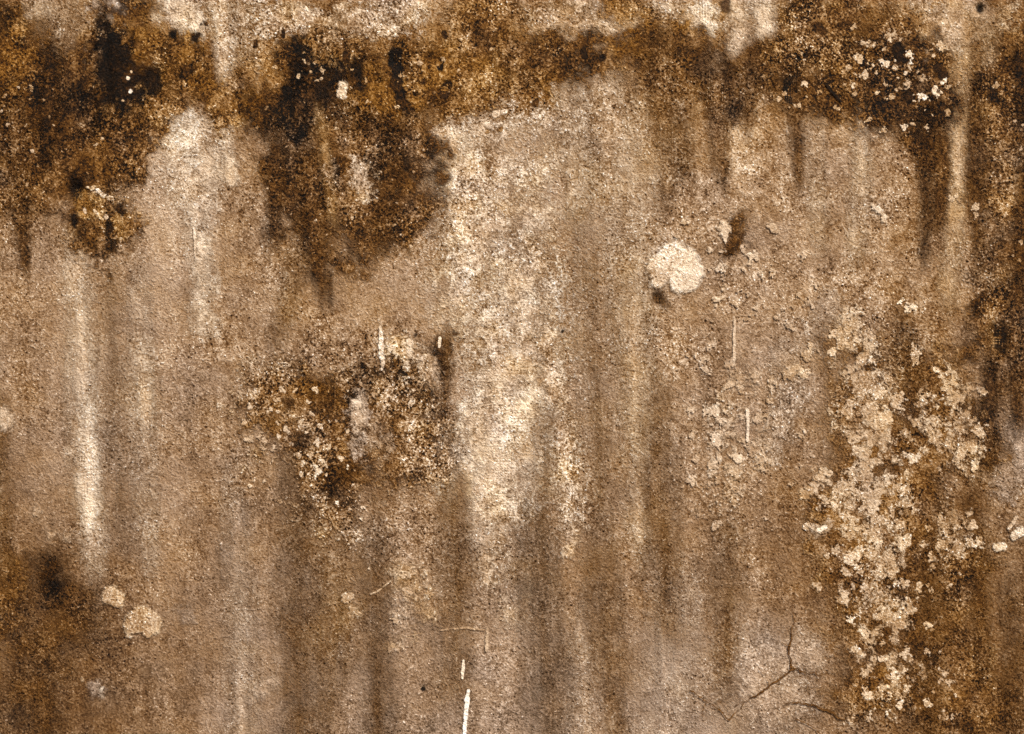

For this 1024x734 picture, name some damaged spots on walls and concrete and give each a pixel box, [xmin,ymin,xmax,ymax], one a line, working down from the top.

leakage [0,498,108,734]
peeling [217,352,487,548]
leakage [0,0,713,734]
spalling [653,292,669,307]
crack [689,613,849,734]
peeling [680,284,1024,734]
leakage [684,0,1024,477]